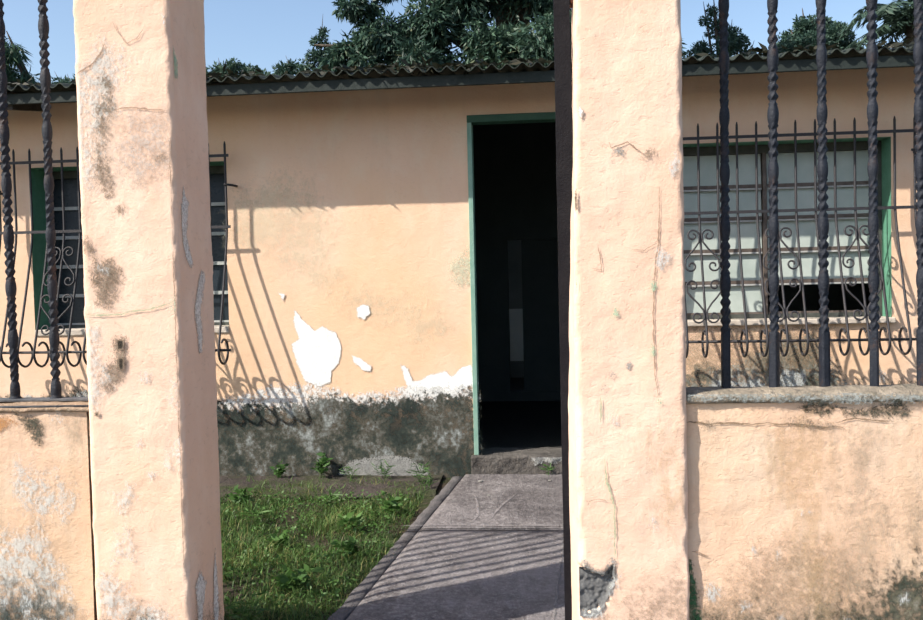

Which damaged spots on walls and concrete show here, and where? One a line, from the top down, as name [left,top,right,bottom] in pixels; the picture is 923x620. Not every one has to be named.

damp [92,77,116,204]
damp [83,236,122,311]
peeling [181,186,205,353]
peeling [356,304,371,320]
damp [100,336,128,394]
peeling [217,309,479,413]
damp [686,326,923,421]
damp [217,385,484,478]
crack [689,418,895,432]
damp [0,574,76,620]
spalling [579,558,621,619]
damp [630,539,923,620]